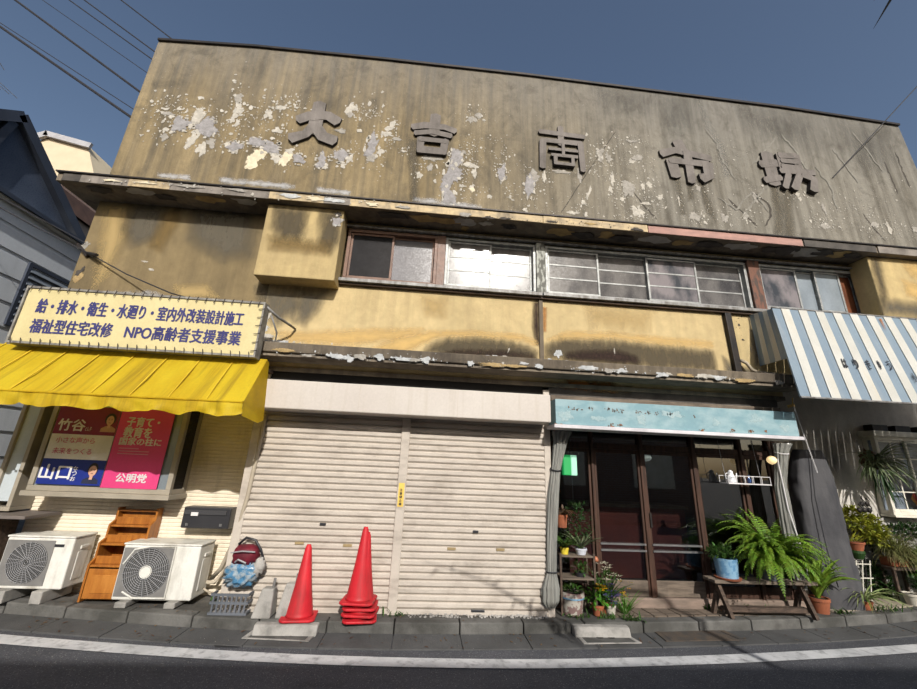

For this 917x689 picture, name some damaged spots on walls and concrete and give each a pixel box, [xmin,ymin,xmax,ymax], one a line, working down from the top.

peeling [139,74,410,181]
peeling [277,104,774,244]
damp [100,207,179,277]
damp [193,209,252,256]
damp [179,287,212,297]
peeling [467,348,562,369]
damp [288,321,759,372]
peeling [571,366,755,383]